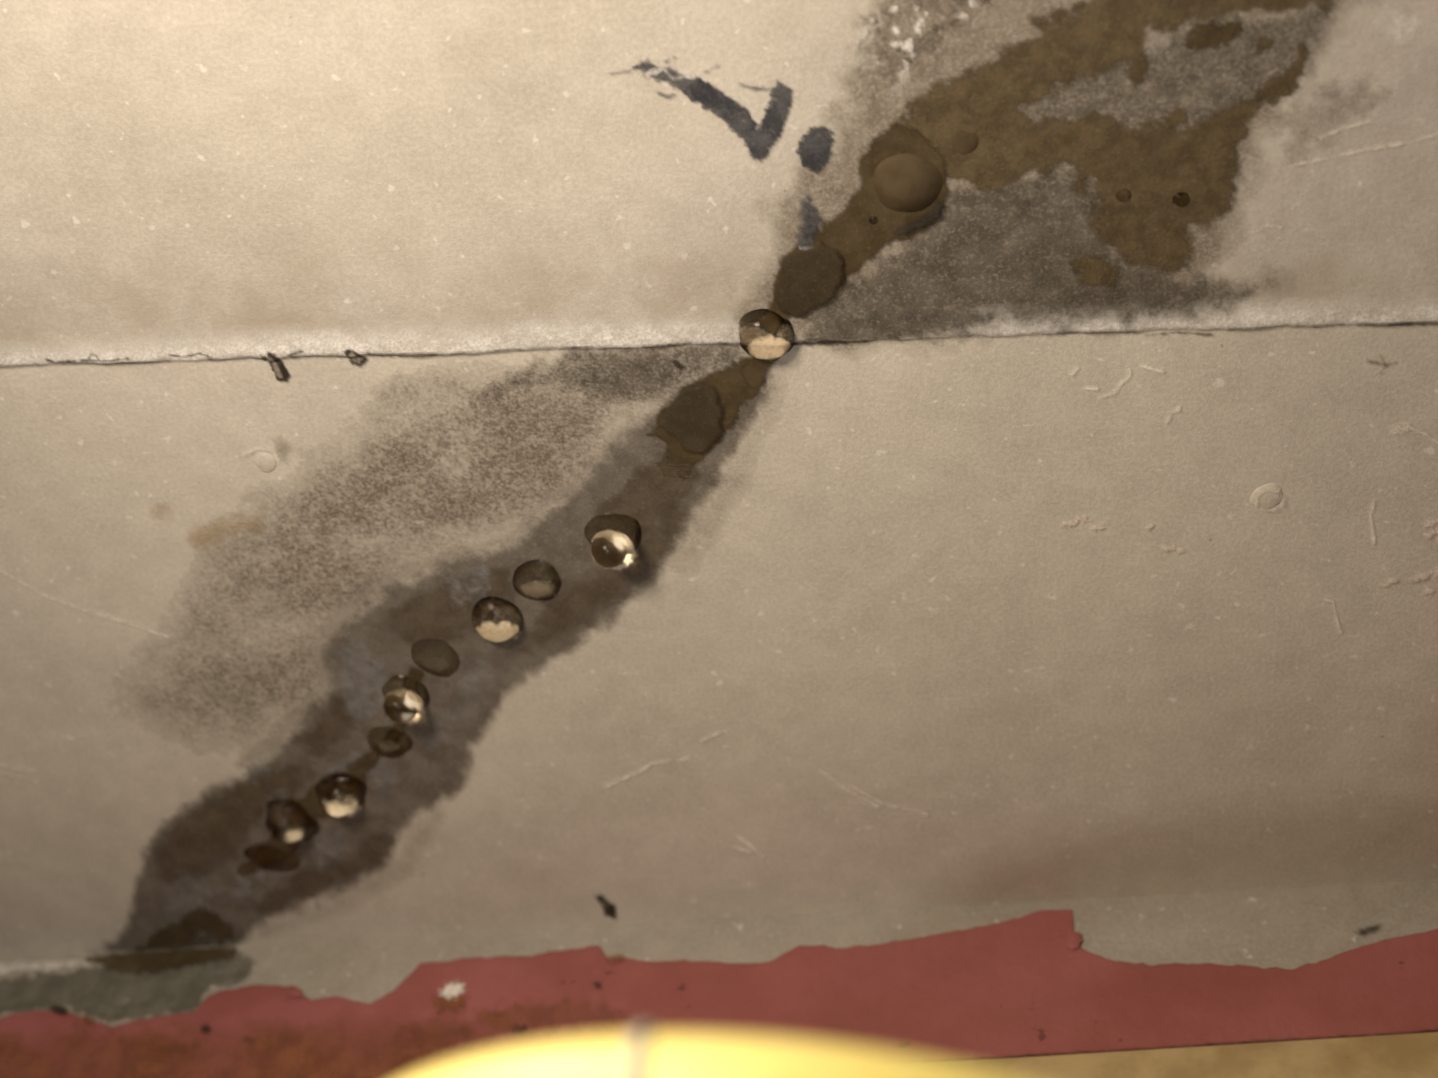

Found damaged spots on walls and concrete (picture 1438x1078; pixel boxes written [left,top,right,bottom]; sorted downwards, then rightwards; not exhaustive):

leakage [744,0,1438,348]
leakage [0,320,787,1021]
spalling [596,895,615,919]
peeling [0,909,1438,1078]